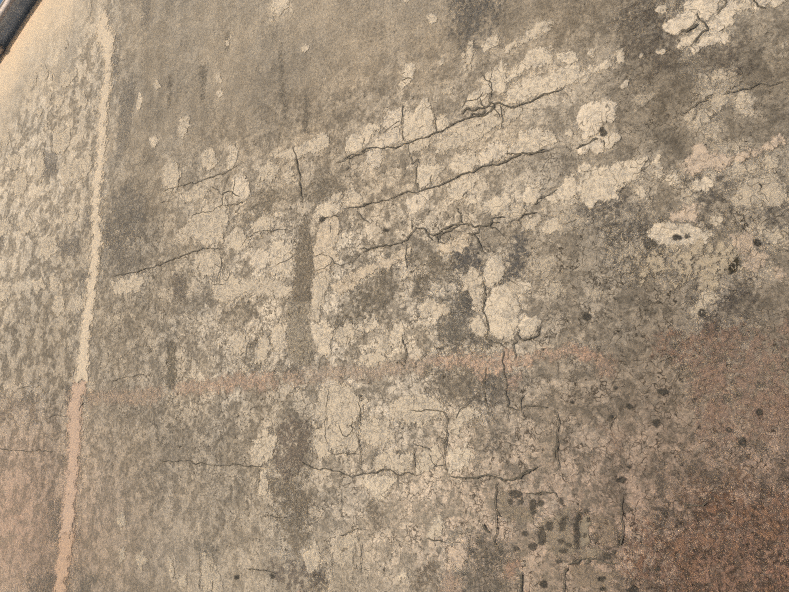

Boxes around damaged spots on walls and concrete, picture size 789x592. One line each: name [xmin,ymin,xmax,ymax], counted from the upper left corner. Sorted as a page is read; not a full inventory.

damp [448,0,501,49]
damp [622,0,680,75]
peeling [655,0,786,54]
damp [111,38,136,166]
crack [160,162,243,217]
crack [315,68,577,272]
peeling [345,19,625,217]
peeling [506,67,789,317]
damp [697,188,718,209]
crack [110,247,226,285]
peeling [311,382,482,500]
crack [302,280,560,547]